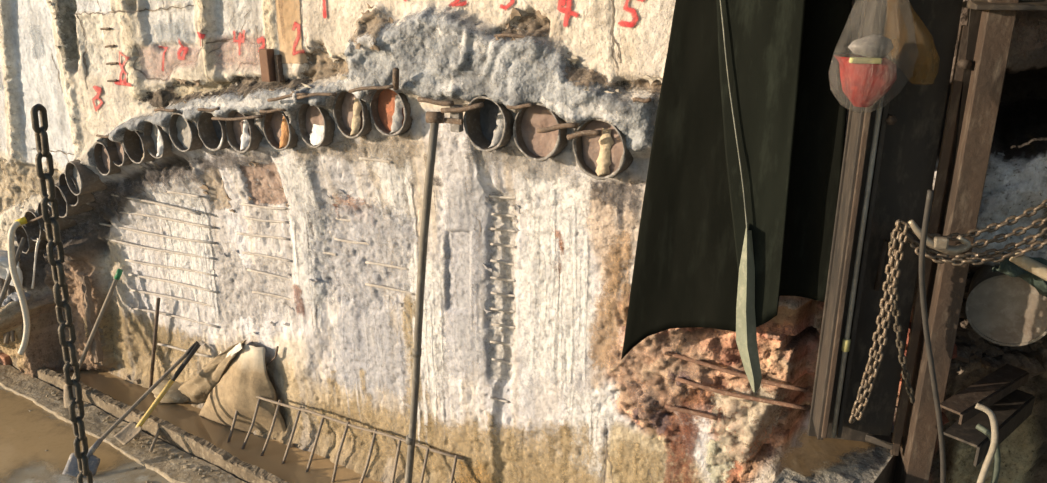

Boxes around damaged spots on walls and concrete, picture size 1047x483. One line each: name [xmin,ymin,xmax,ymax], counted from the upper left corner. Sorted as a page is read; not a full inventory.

crack [610,0,621,76]
spalling [675,377,807,411]
rust [664,389,705,483]